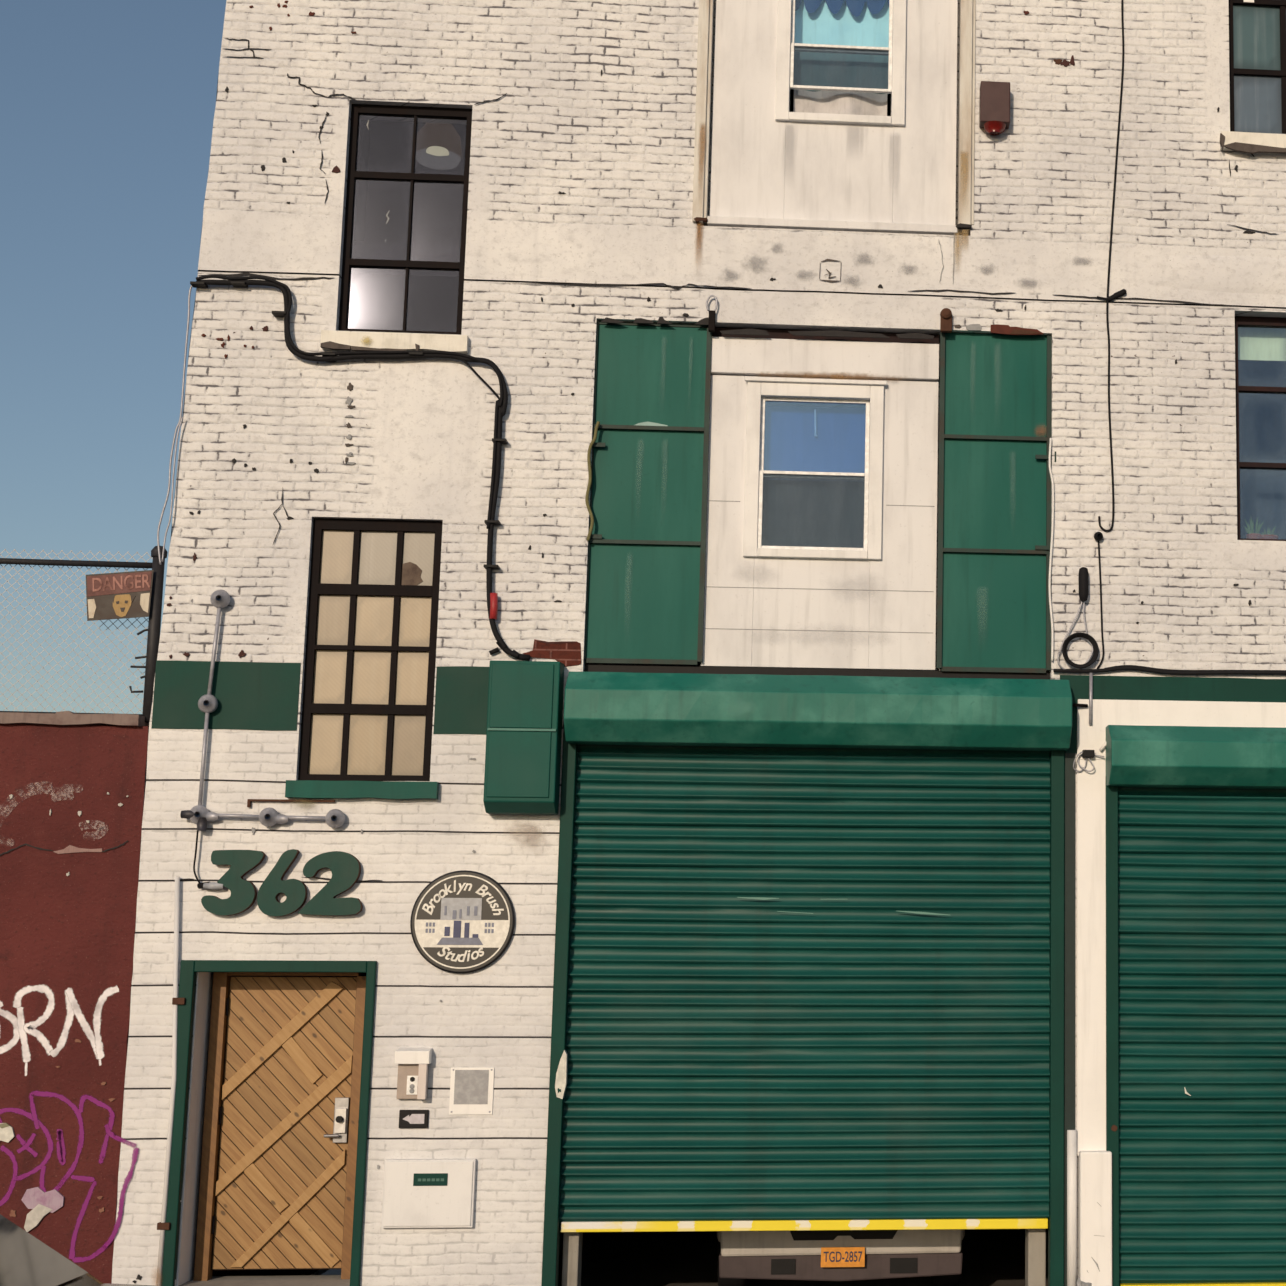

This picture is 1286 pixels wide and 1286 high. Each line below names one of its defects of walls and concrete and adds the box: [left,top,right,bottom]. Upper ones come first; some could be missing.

flaking render [523,639,581,667]